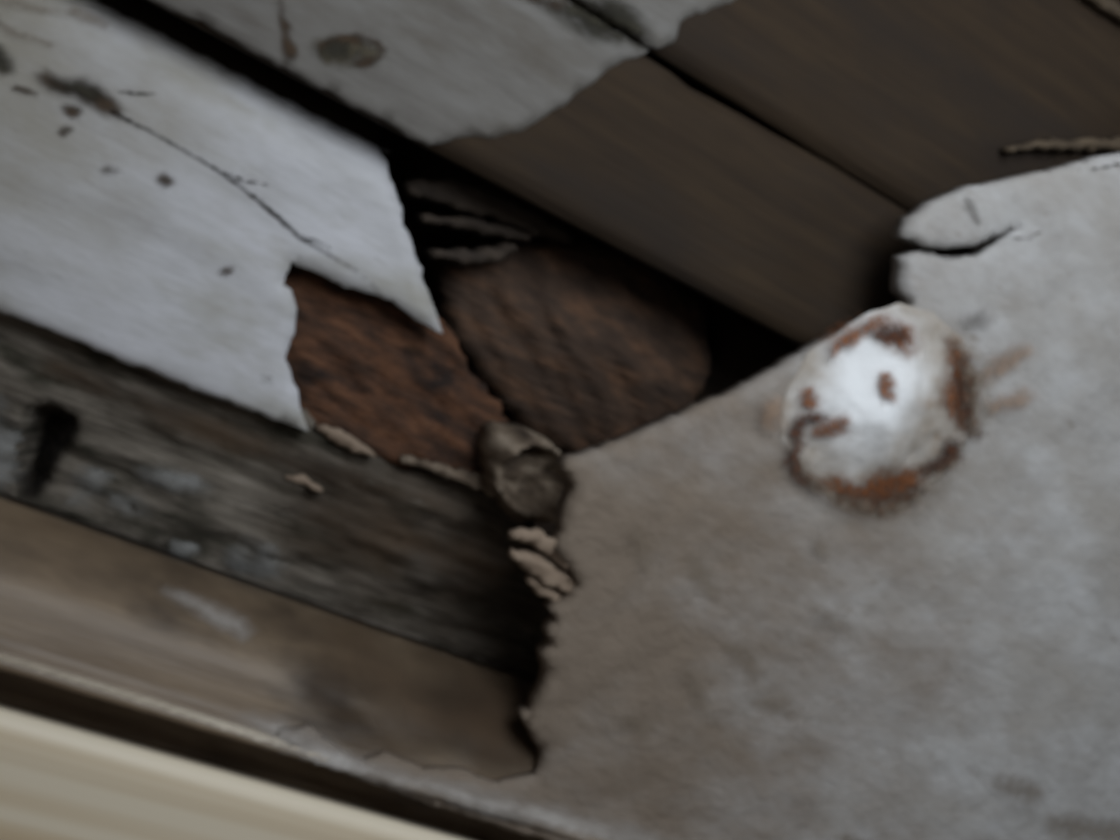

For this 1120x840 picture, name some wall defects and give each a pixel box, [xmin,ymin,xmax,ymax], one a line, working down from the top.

crack [111,91,350,267]
crack [911,200,1040,257]
spalling [284,262,509,482]
corrosion [832,315,914,356]
corrosion [785,340,1030,515]
spalling [508,527,576,601]